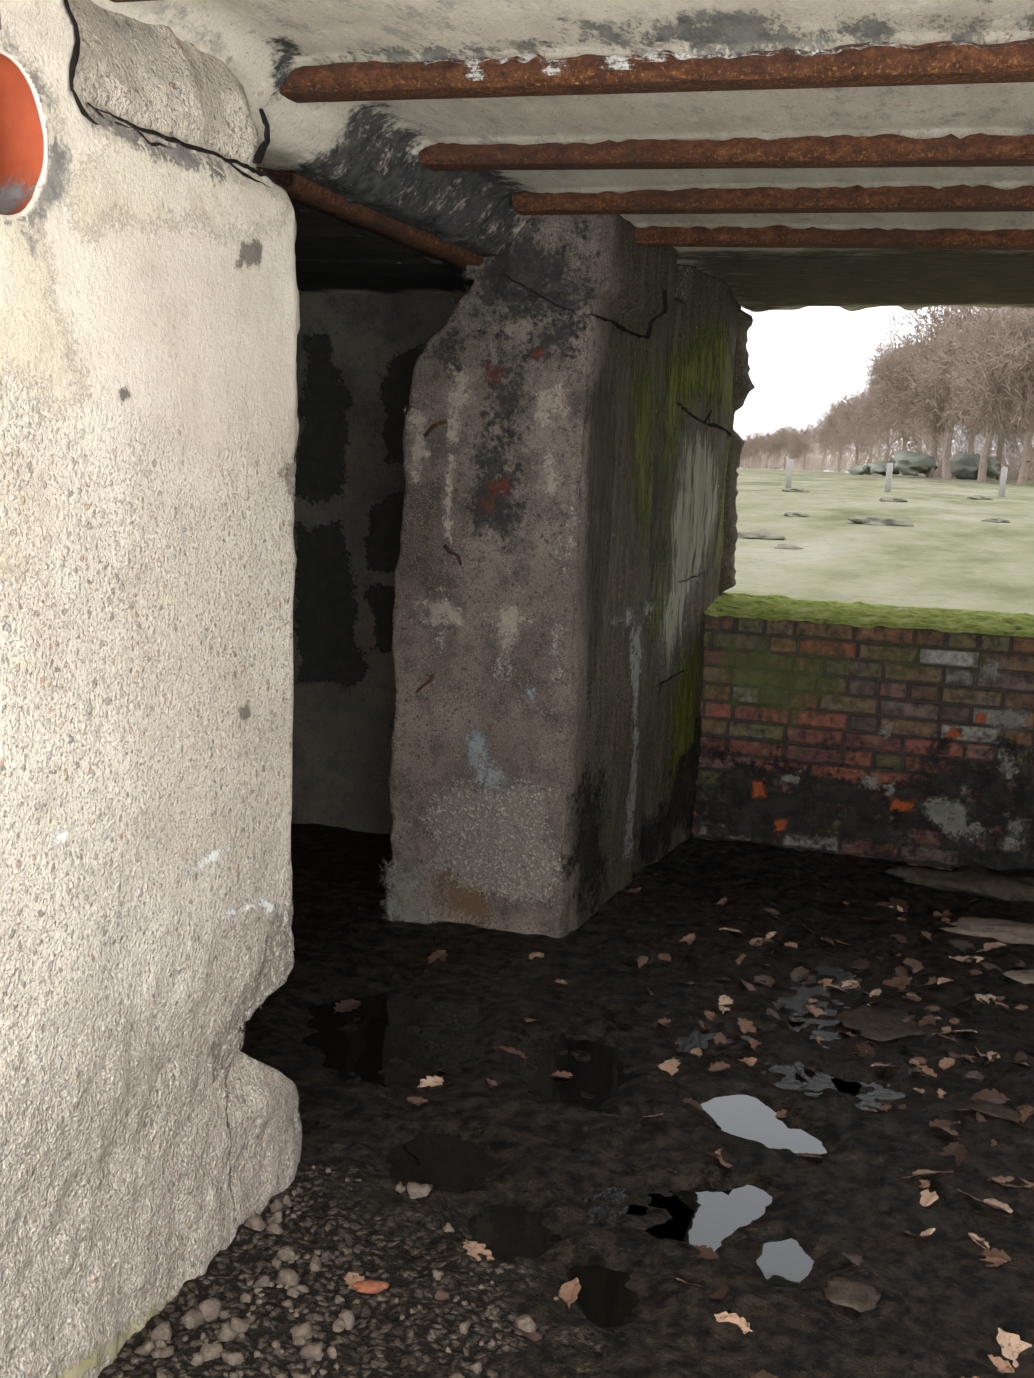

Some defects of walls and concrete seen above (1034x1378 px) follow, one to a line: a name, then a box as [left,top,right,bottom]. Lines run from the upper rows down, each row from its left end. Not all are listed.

crack [64,0,295,211]
damp [276,104,536,257]
crack [676,401,732,436]
damp [562,351,1034,922]